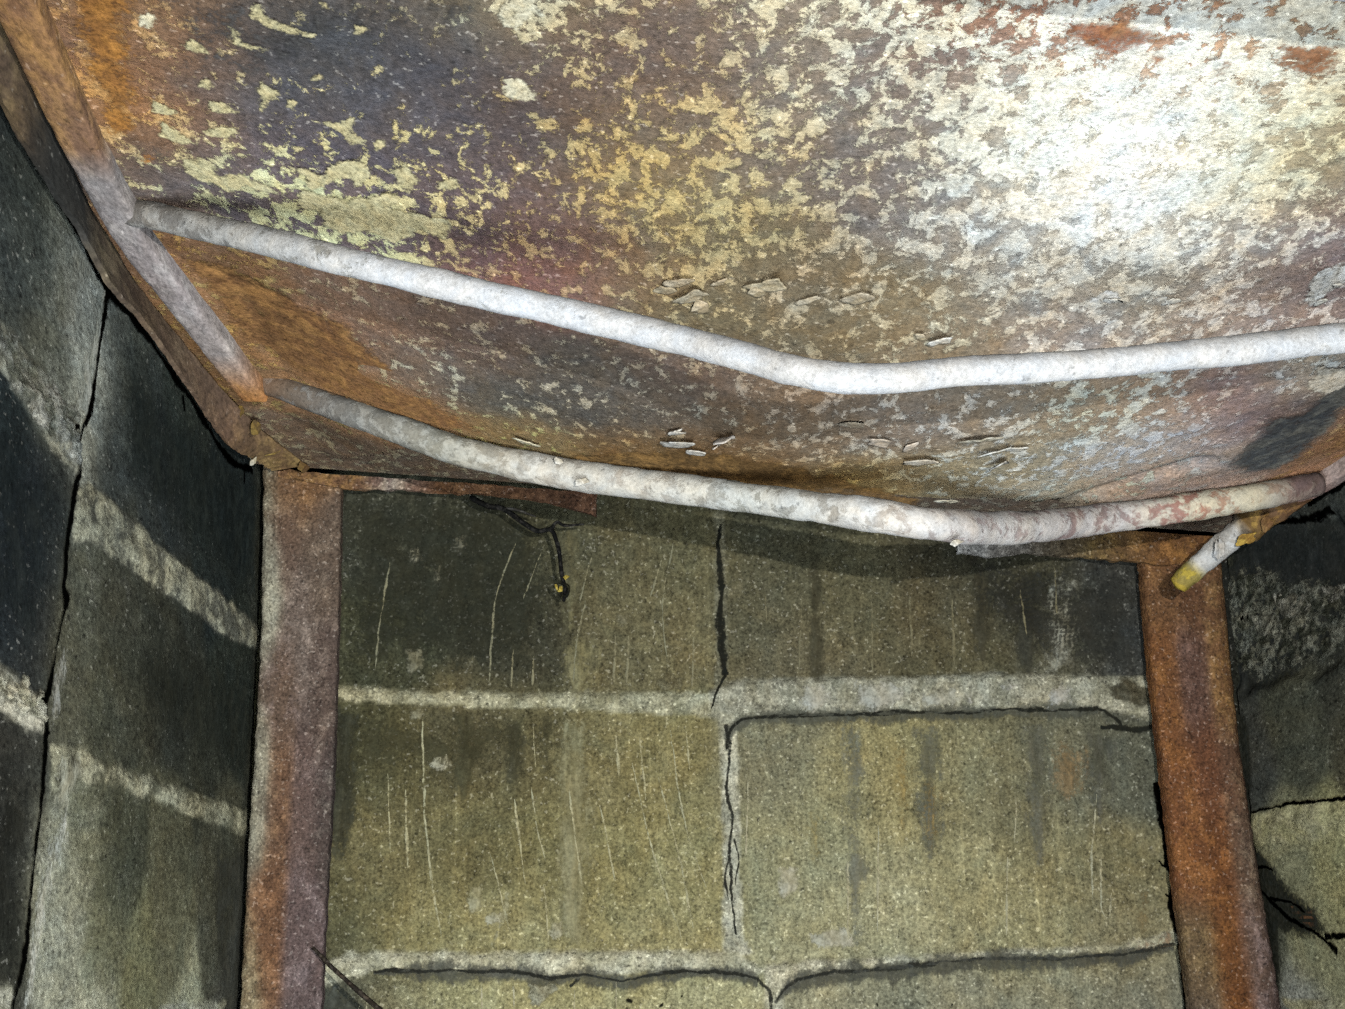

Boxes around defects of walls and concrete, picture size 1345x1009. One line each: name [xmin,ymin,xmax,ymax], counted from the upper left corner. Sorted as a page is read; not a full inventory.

rust [76,0,135,134]
rust [1068,23,1161,64]
rust [1276,46,1337,73]
rust [187,260,479,435]
rust [576,449,920,505]
crack [13,200,253,1009]
crack [711,524,1152,935]
crack [373,782,1186,1009]